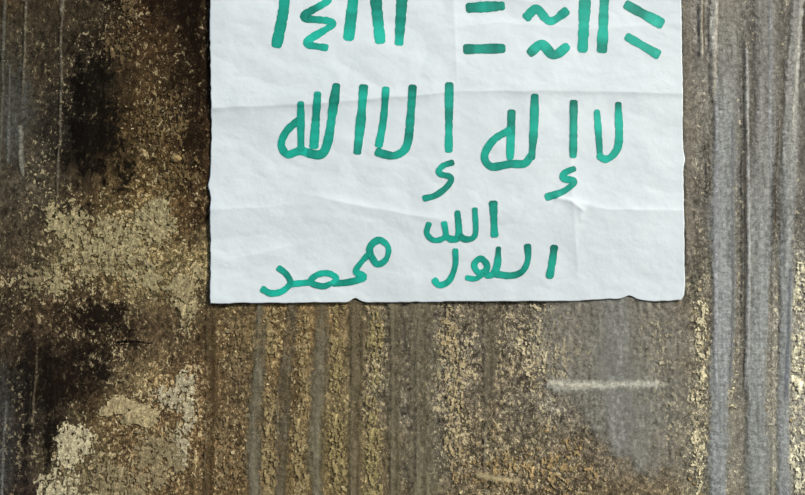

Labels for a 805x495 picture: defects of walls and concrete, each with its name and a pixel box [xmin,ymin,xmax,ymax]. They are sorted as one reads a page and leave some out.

water stain [57,36,136,193]
water stain [149,0,211,189]
water stain [683,1,693,269]
water stain [0,394,12,495]
water stain [12,313,113,495]
water stain [75,299,137,338]
water stain [702,0,805,495]